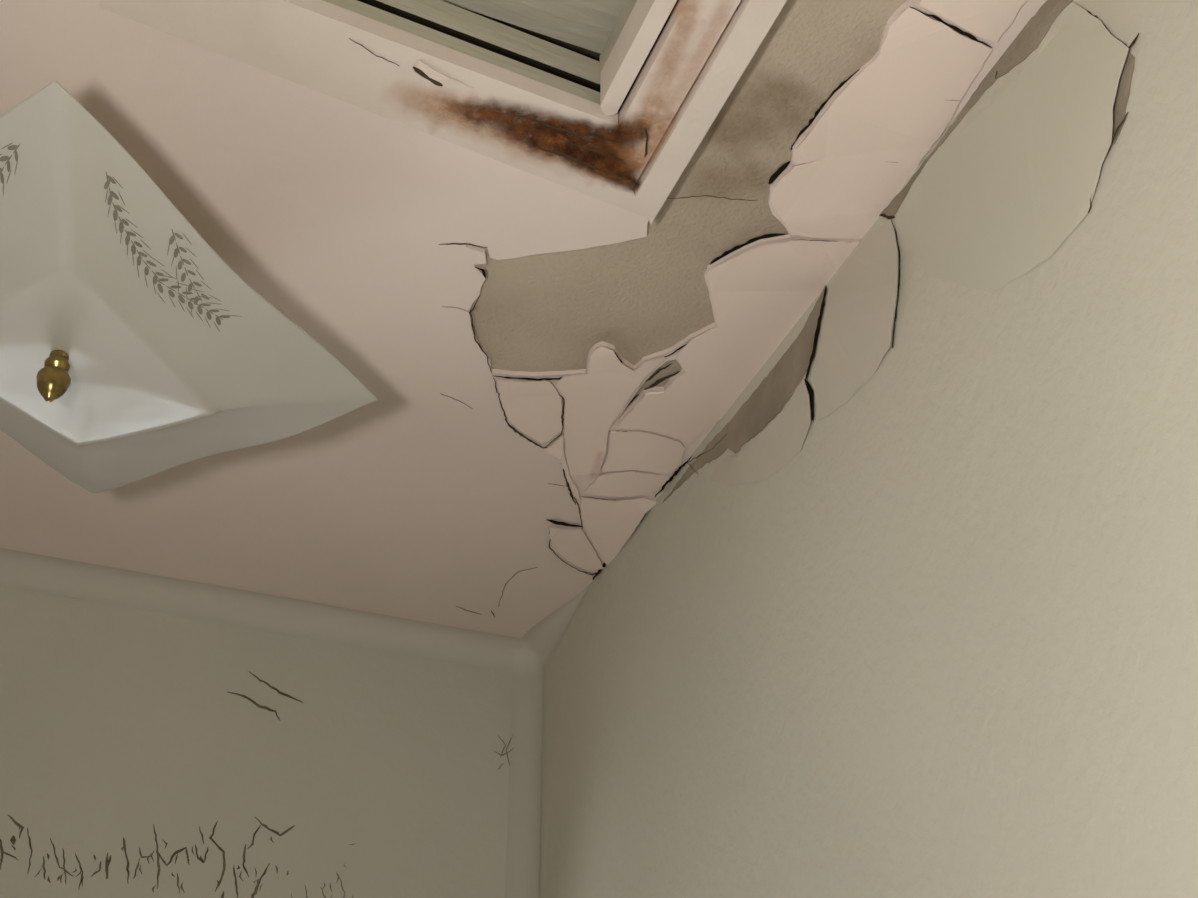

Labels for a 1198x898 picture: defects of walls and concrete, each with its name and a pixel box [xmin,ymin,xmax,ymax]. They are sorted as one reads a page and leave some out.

corrosion [436,98,664,190]
peeling [470,0,1135,571]
crack [439,243,723,617]
crack [227,671,303,721]
crack [0,815,355,898]